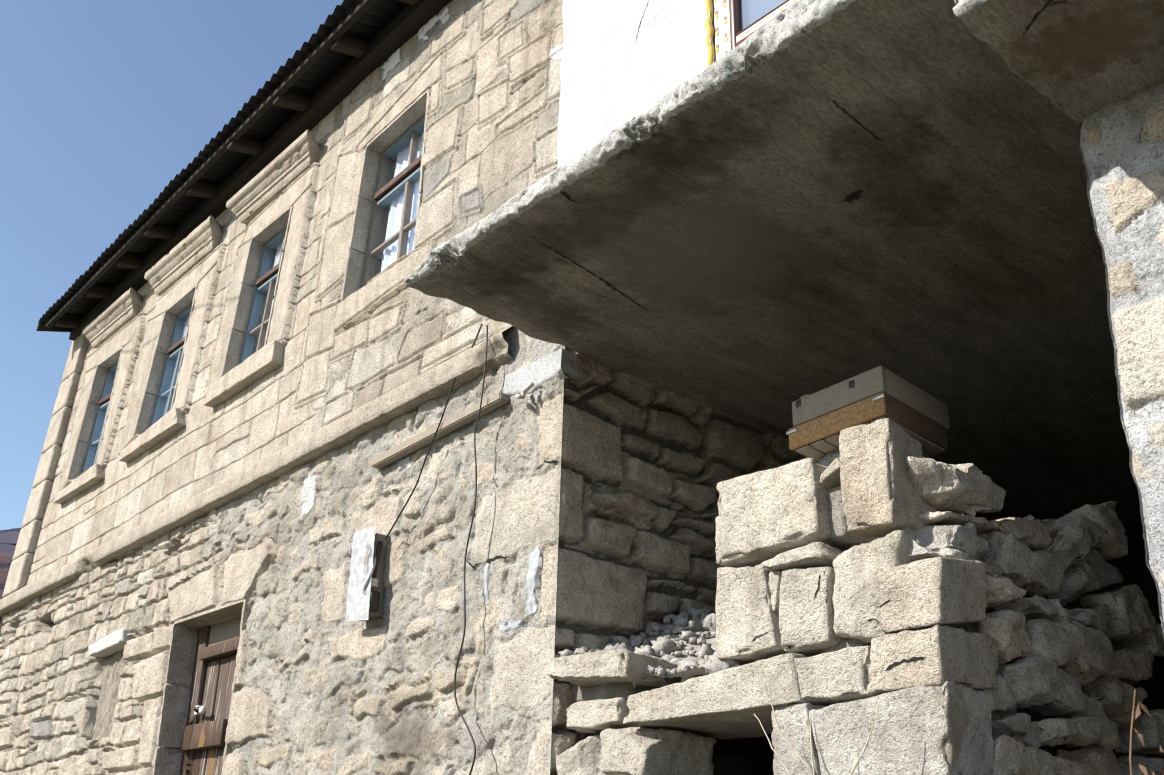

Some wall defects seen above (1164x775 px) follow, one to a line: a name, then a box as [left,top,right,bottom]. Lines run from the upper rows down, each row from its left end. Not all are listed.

crack [1021,0,1068,38]
crack [534,240,650,313]
corrosion [0,552,13,581]